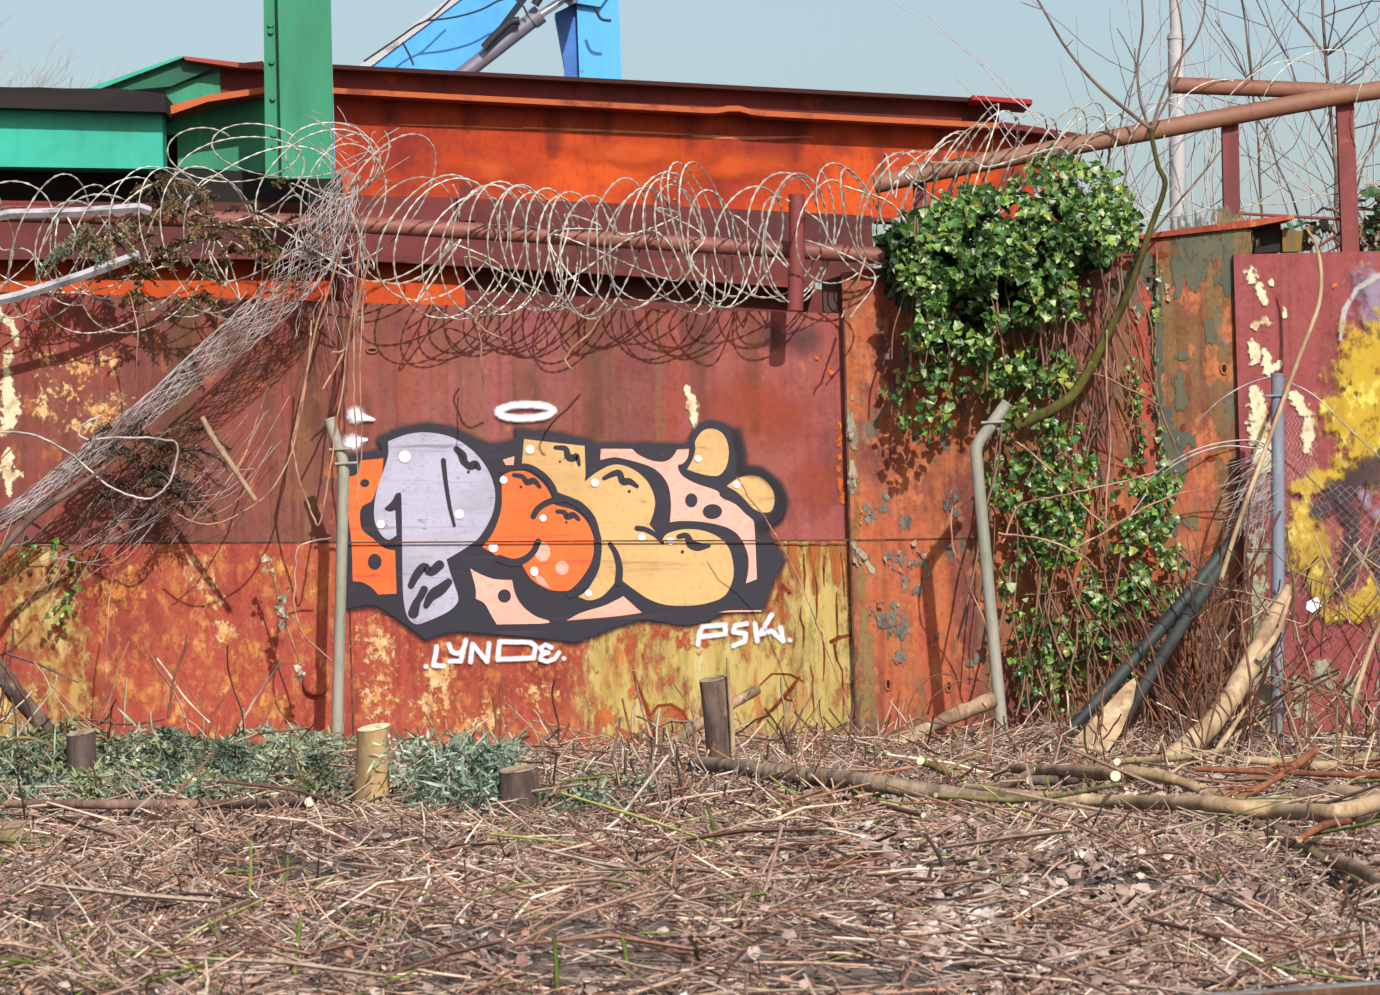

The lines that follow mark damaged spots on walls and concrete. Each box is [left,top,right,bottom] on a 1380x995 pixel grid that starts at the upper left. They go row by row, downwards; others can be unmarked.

rust [584,141,790,178]
peeling [0,305,24,497]
rust [28,348,135,435]
peeling [939,400,951,454]
peeling [1117,203,1287,498]
peeling [1288,390,1316,455]
peeling [846,395,934,667]
peeling [1172,512,1202,537]
rust [0,544,154,739]
rust [182,550,260,708]
rust [354,610,510,742]
rust [516,541,855,754]